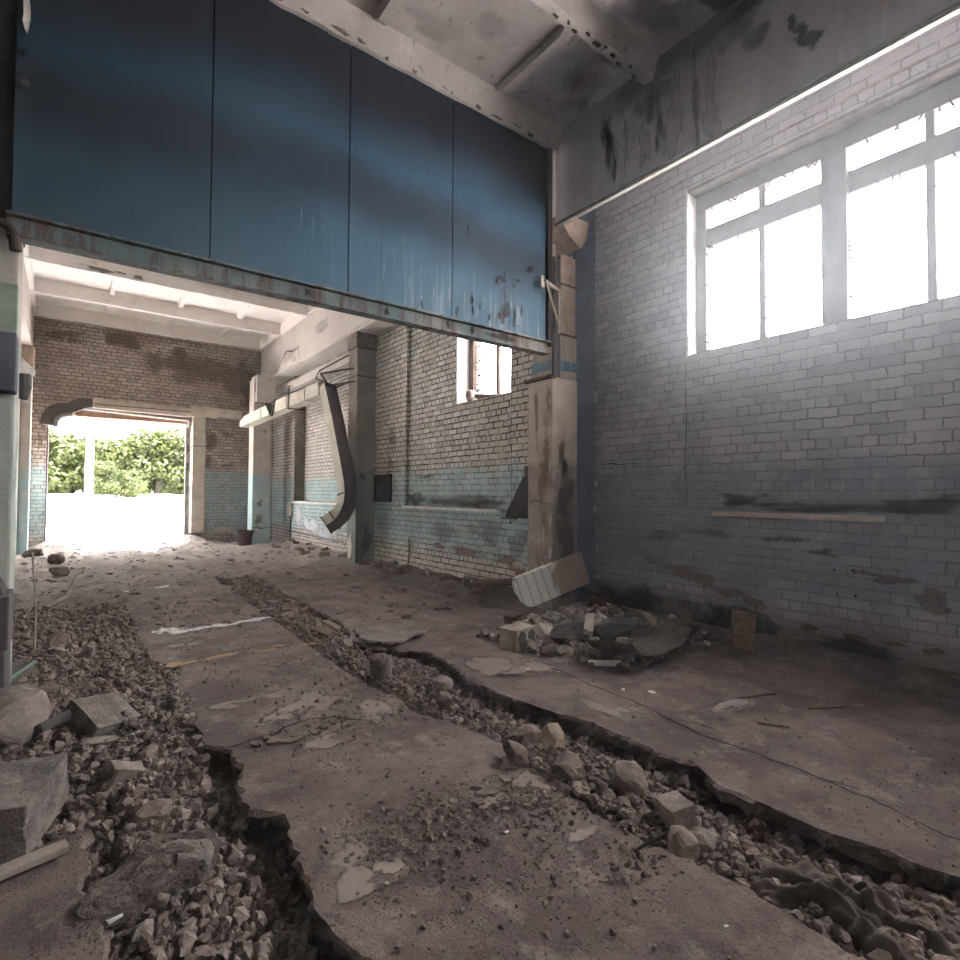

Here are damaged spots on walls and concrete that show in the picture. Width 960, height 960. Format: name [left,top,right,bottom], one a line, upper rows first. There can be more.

water stain [788,14,823,50]
water stain [601,47,722,181]
water stain [106,333,140,349]
water stain [149,348,254,406]
water stain [557,443,573,558]
water stain [724,494,959,514]
crack [554,668,960,840]